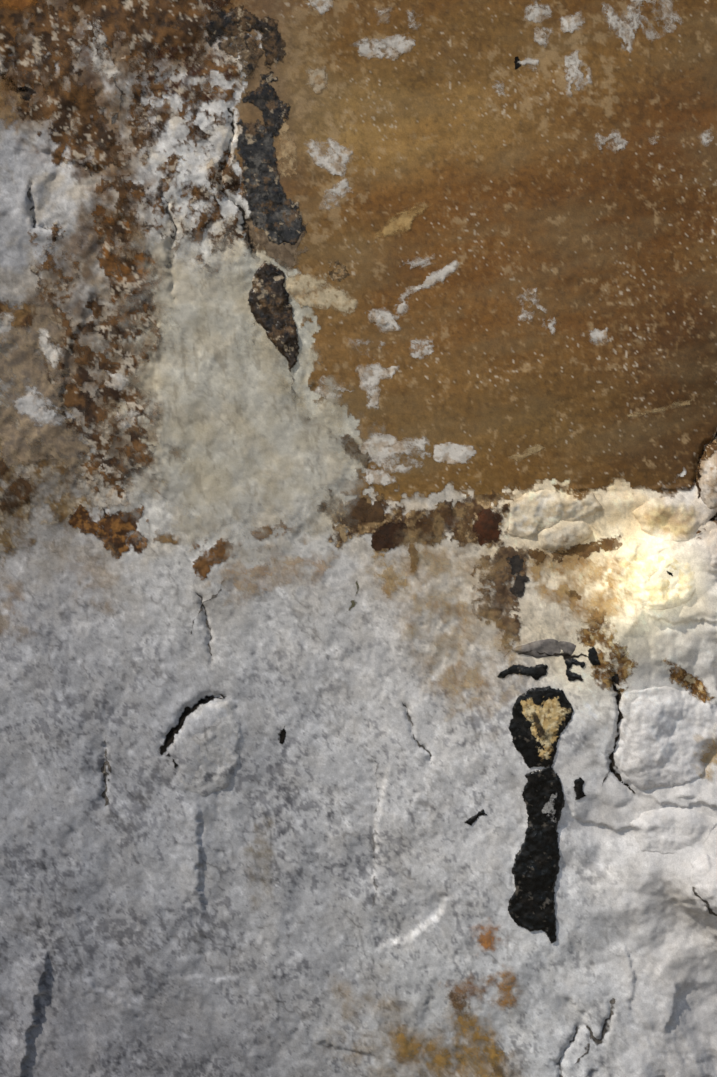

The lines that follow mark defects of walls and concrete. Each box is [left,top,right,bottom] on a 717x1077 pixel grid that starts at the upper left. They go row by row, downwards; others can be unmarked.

spalling [357,12,415,59]
spalling [526,4,582,44]
peeling [603,0,679,52]
spalling [565,52,591,96]
spalling [307,139,353,209]
corrosion [0,0,717,692]
spalling [78,238,476,555]
corrosion [663,659,714,703]
crack [159,694,225,775]
water stain [529,712,546,748]
corrosion [701,740,717,777]
crack [692,887,717,916]